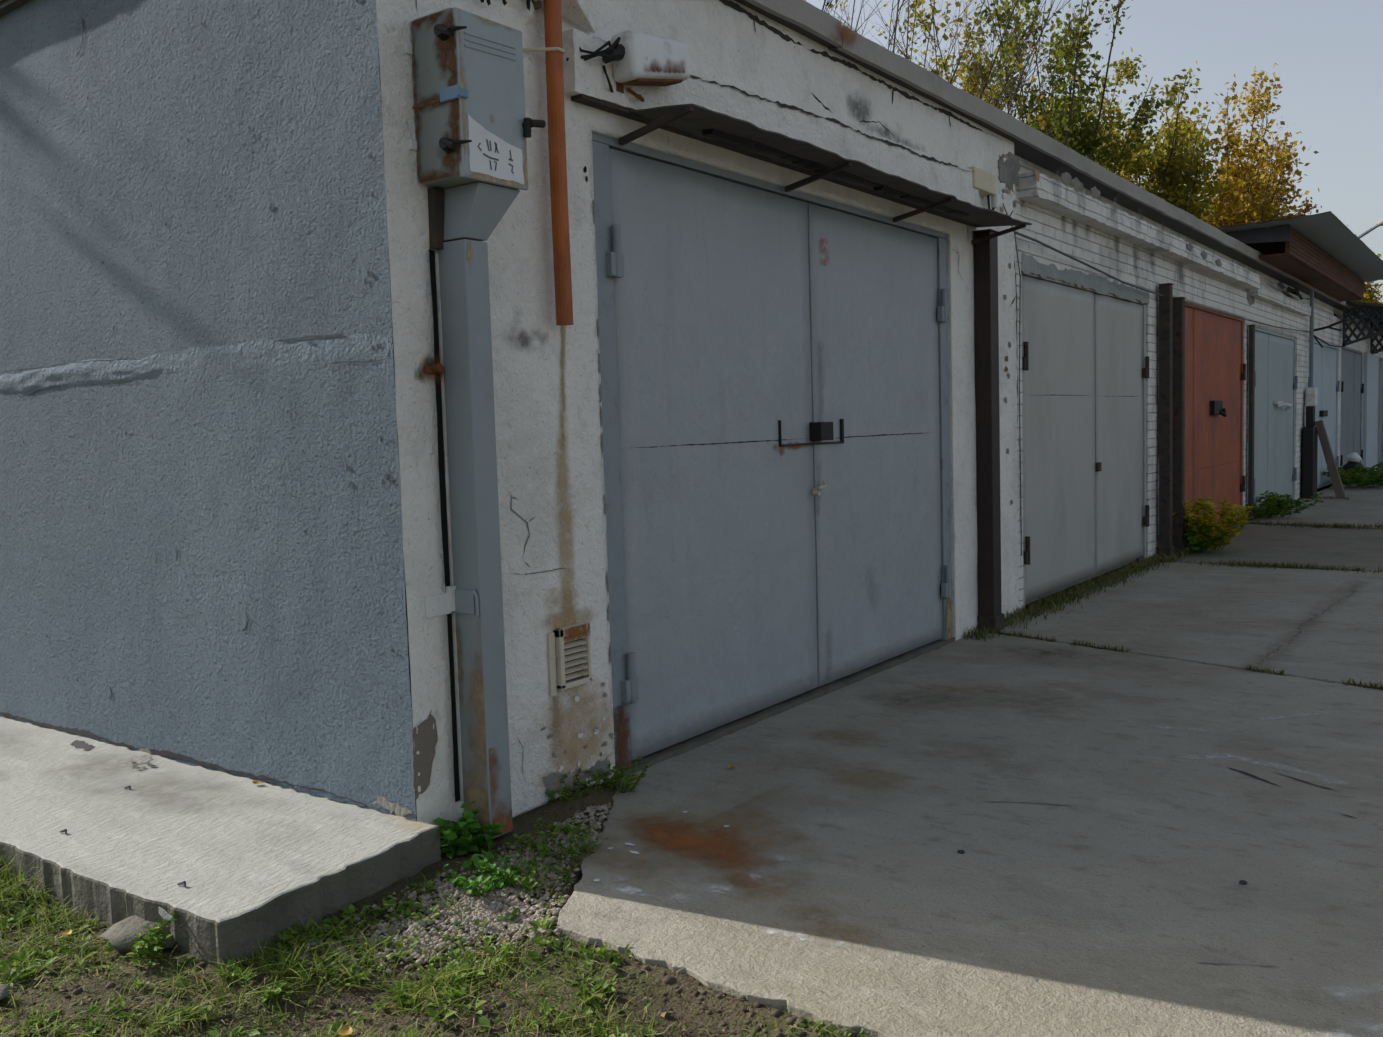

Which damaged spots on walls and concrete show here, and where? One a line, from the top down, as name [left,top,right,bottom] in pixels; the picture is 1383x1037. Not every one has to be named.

crack [690,0,1001,171]
crack [274,333,389,364]
rust [419,361,445,378]
spalling [429,250,450,591]
crack [509,492,567,575]
rust [549,417,589,639]
flaking render [371,613,460,817]